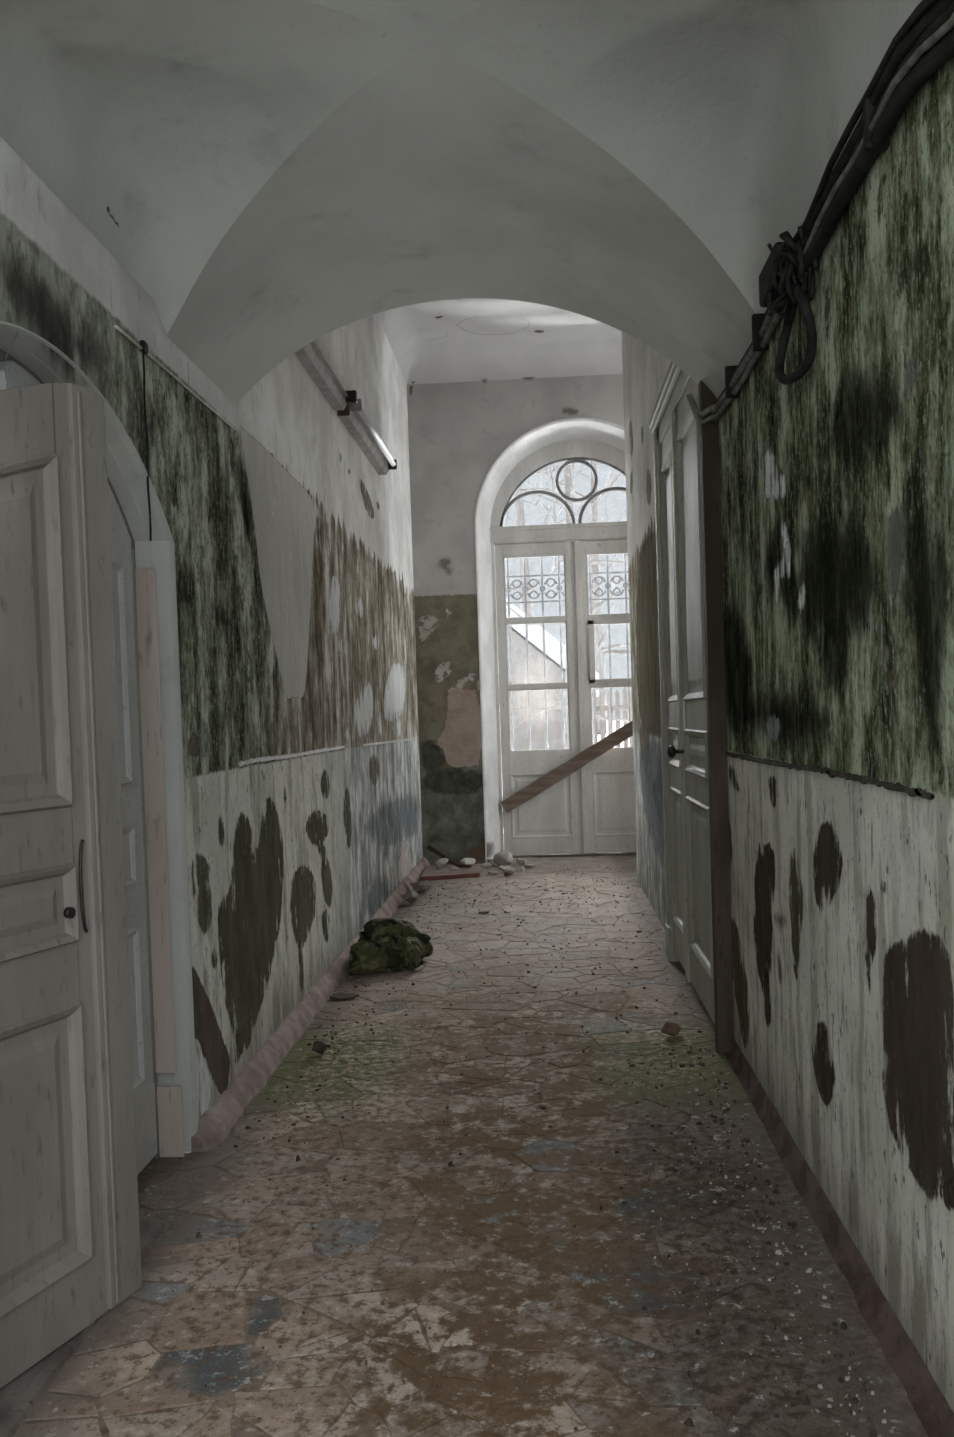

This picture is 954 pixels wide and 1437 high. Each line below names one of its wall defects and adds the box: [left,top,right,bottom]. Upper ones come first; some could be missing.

water stain [4,263,95,374]
peeling [237,661,416,767]
peeling [328,574,342,652]
peeling [417,609,452,647]
spalling [435,661,482,768]
water stain [723,610,828,740]
water stain [768,509,875,694]
water stain [902,519,945,751]
water stain [191,770,351,1064]
water stain [731,821,843,1048]
water stain [812,1021,835,1106]
water stain [865,883,954,1210]